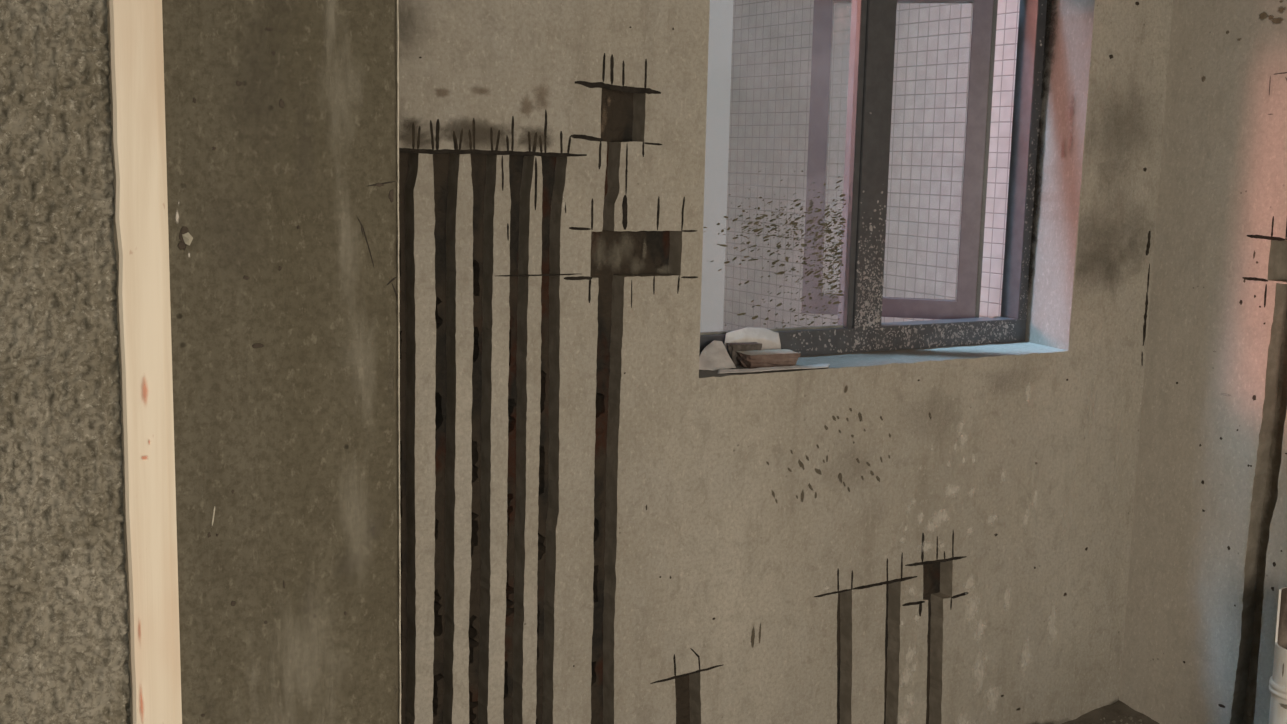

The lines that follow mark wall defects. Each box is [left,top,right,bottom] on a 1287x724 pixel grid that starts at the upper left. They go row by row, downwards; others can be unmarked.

crack [1141,231,1151,365]